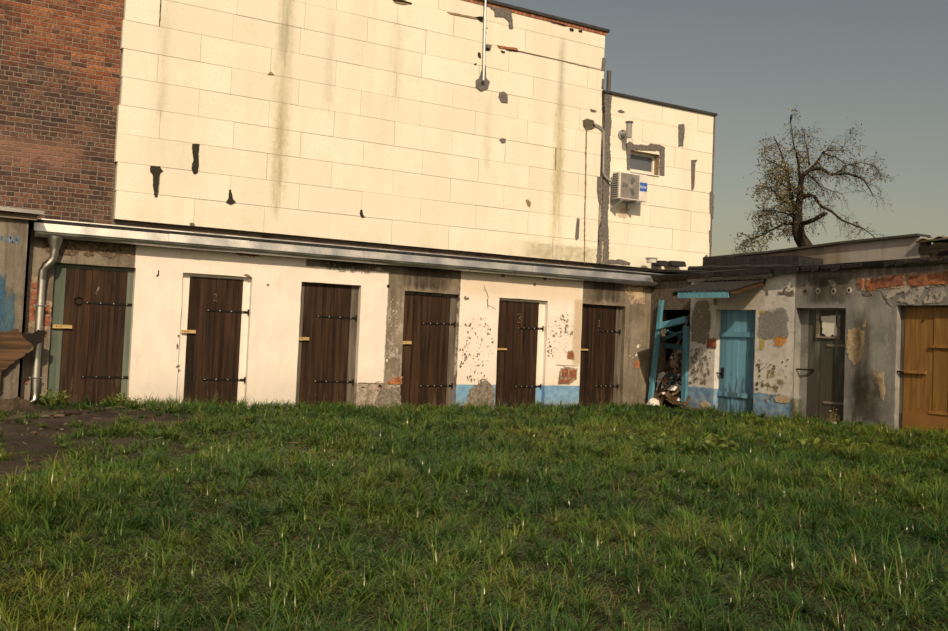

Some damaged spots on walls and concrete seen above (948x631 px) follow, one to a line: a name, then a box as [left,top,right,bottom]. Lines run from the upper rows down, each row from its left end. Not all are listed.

peeling [0,274,53,332]
flaking render [848,269,948,305]
spalling [459,317,495,409]
flaking render [547,314,578,385]
peeling [689,299,717,384]
peeling [846,319,866,365]